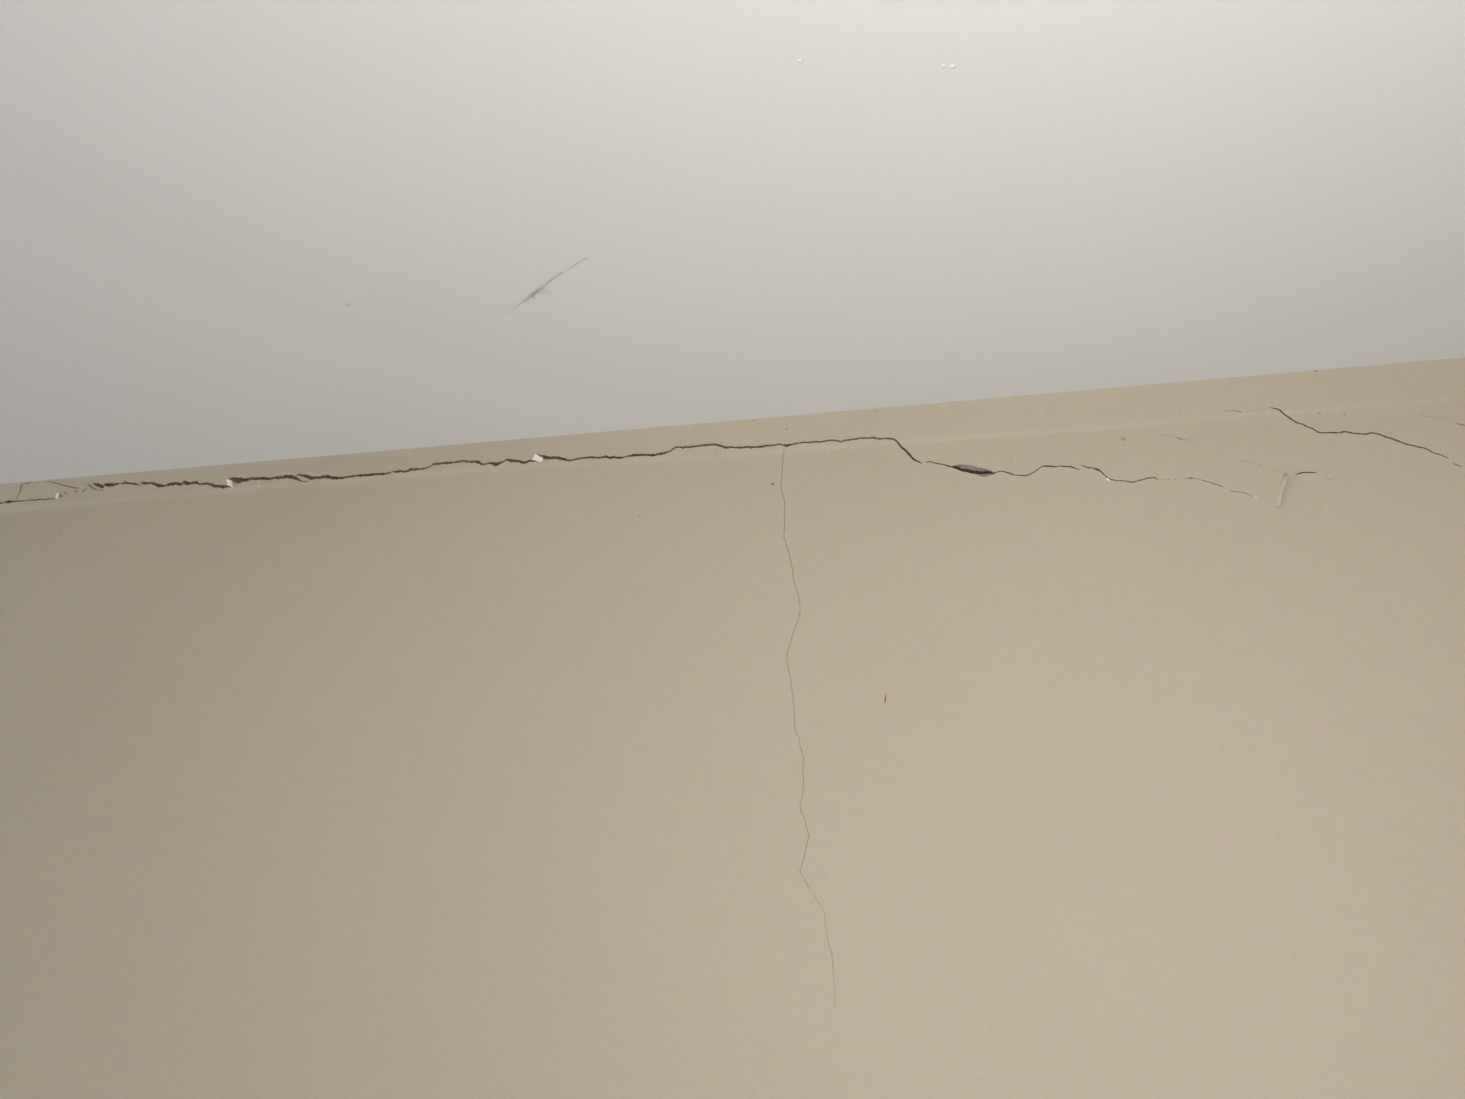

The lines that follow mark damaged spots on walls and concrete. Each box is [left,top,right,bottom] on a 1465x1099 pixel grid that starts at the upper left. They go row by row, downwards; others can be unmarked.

crack [995,420,1357,499]
crack [1224,407,1465,467]
crack [0,436,952,1009]